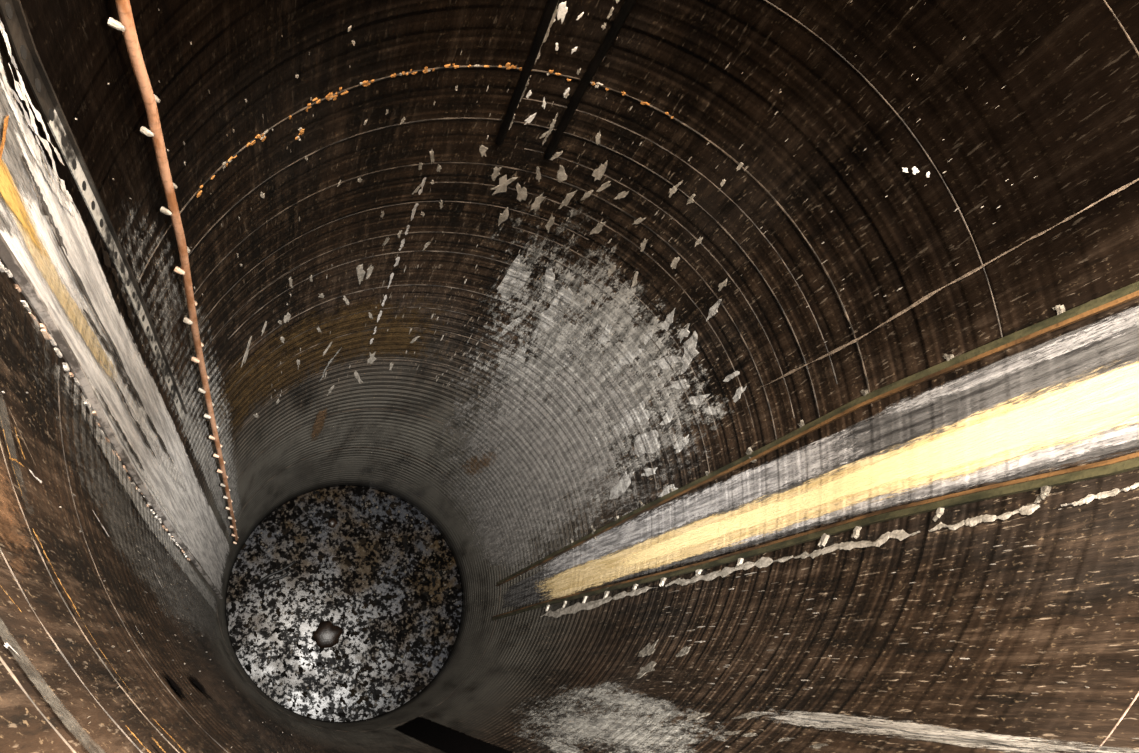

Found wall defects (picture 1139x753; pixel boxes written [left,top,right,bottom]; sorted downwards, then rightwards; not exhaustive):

rust [306,87,348,112]
rust [391,63,532,78]
rust [197,130,268,198]
damp [434,208,1139,618]